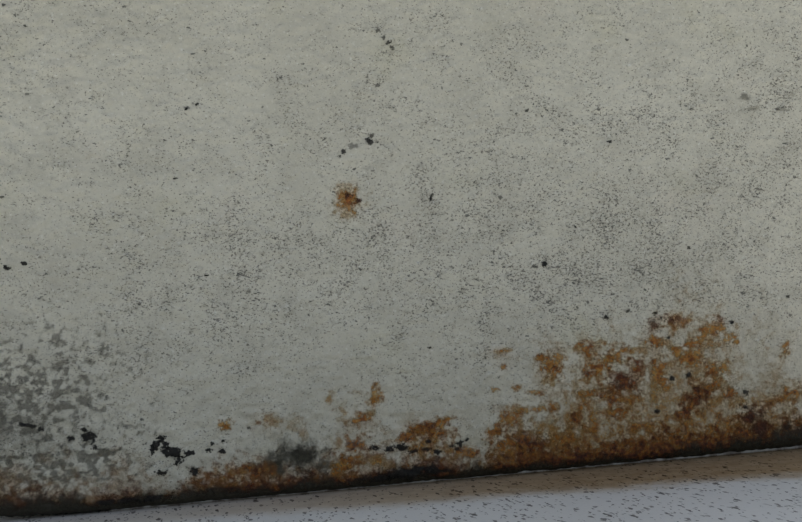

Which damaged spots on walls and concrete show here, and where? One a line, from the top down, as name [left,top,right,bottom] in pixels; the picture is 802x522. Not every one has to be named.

rust [336,188,362,215]
rust [166,315,802,497]